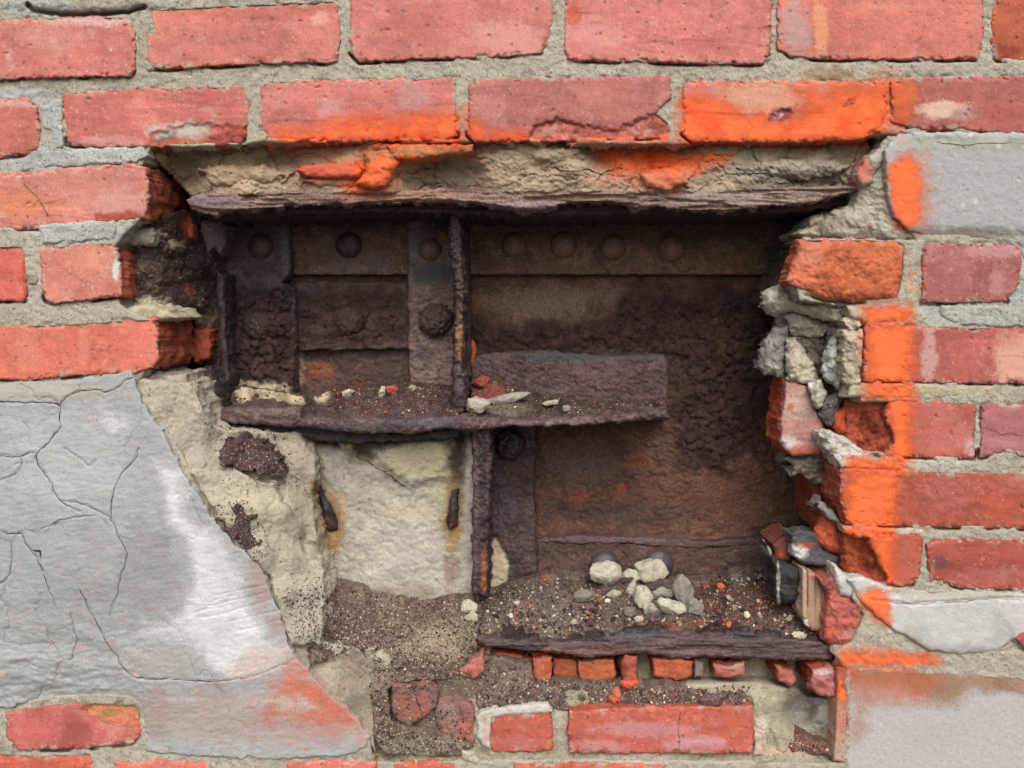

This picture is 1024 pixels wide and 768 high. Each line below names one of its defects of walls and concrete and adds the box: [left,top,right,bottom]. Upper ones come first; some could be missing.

spalling [154,115,913,302]
corrosion [201,219,296,407]
crack [0,377,296,682]
spalling [138,376,377,752]
corrosion [311,482,342,551]
corrosion [305,438,403,458]
corrosion [443,437,467,550]
corrosion [472,281,774,472]
spalling [806,533,885,645]
spalling [840,398,894,452]
spalling [391,679,475,744]